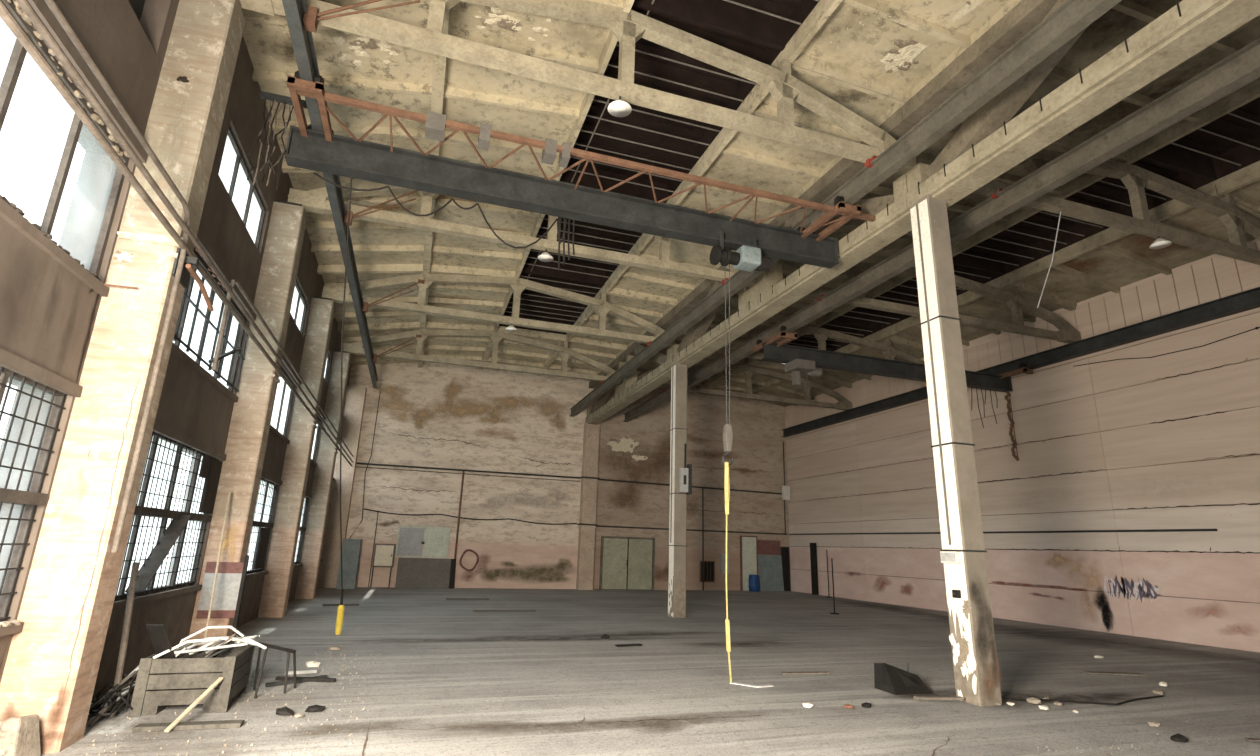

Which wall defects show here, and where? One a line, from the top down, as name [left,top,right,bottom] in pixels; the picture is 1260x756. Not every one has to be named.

damp [382,383,564,428]
peeling [605,437,648,462]
damp [996,582,1083,599]
damp [1026,593,1123,644]
spalling [949,600,977,697]